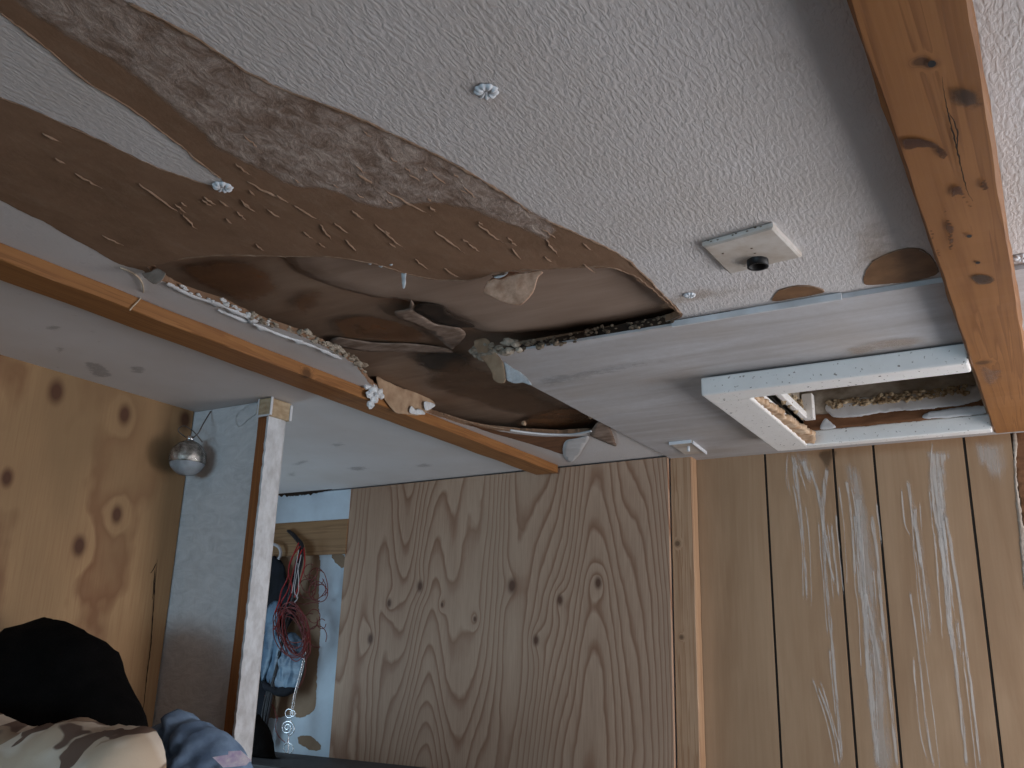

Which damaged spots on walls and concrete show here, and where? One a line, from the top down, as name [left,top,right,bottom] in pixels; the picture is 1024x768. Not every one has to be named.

peeling [0,0,683,373]
peeling [772,285,824,301]
peeling [863,248,939,285]
crack [942,80,973,201]
damp [792,458,898,763]
damp [901,446,980,767]